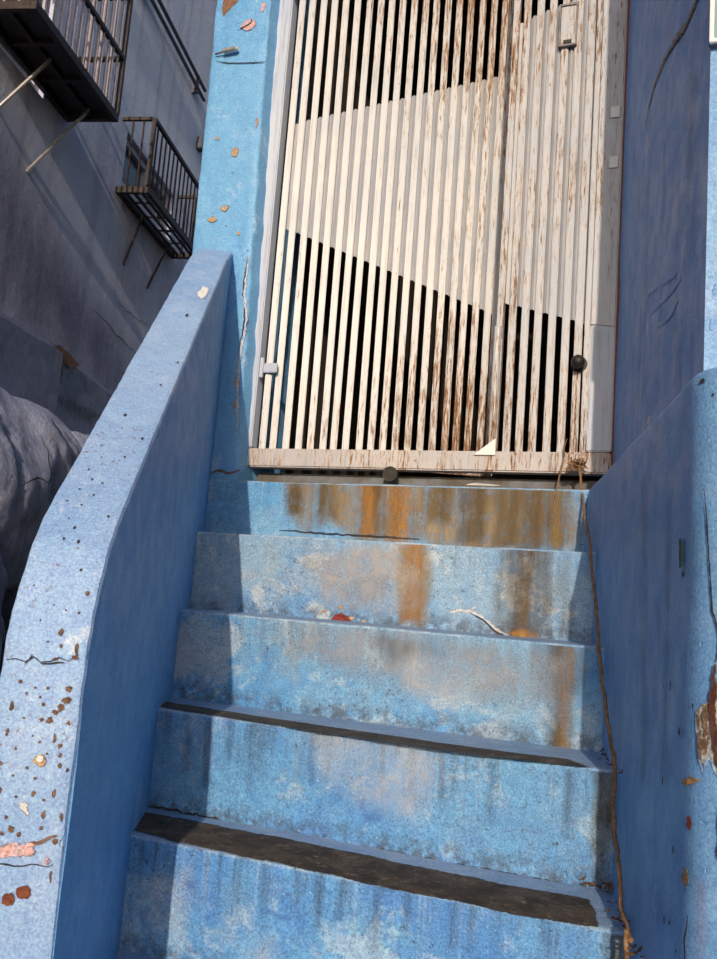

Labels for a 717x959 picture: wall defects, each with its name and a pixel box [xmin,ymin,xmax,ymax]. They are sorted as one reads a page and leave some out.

peeling [221,0,238,16]
peeling [240,2,266,31]
crack [645,0,698,125]
corrosion [288,483,576,637]
crack [704,492,717,630]
crack [5,654,77,664]
peeling [14,679,73,830]
spalling [681,664,717,786]